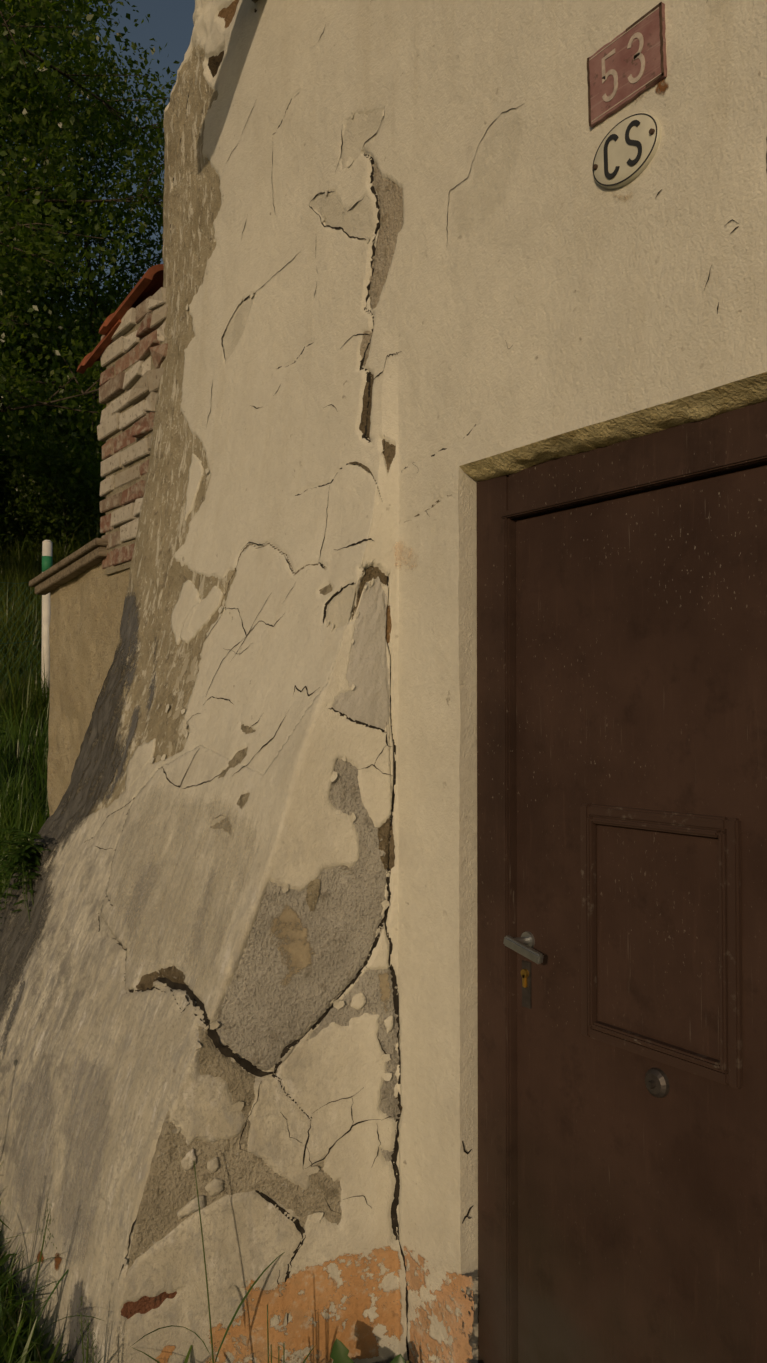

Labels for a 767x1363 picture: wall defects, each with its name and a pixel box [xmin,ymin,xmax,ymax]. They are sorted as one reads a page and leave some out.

flaking render [218,0,239,28]
flaking render [310,109,403,309]
flaking render [56,44,236,820]
flaking render [359,331,396,472]
peeling [319,566,392,730]
flaking render [218,724,256,779]
crack [98,112,477,1361]
crack [86,797,135,862]
flaking render [122,756,403,1275]
flaking render [121,1291,177,1319]
peeling [206,1246,474,1363]